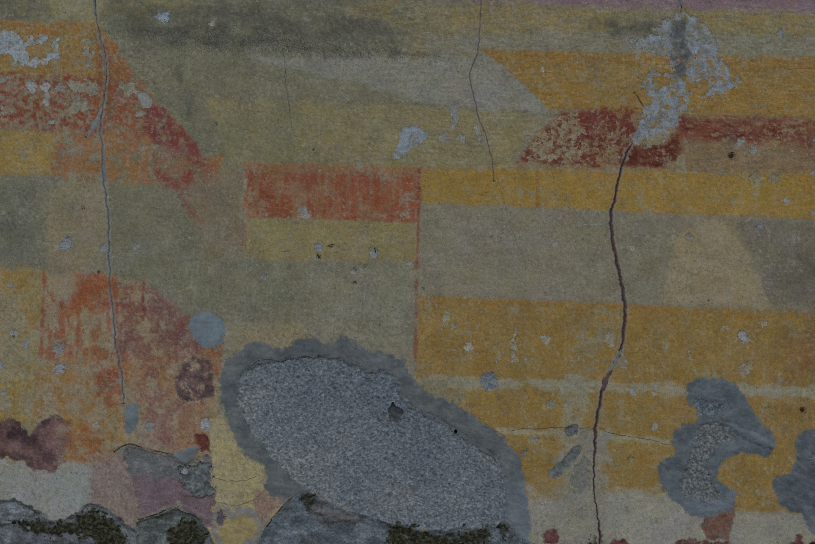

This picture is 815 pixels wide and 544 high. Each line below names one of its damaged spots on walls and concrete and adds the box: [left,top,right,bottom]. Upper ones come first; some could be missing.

peeling [0,29,99,114]
peeling [116,80,153,117]
peeling [391,103,466,160]
crack [467,0,526,266]
flaking render [523,8,742,167]
crack [84,0,127,403]
peeling [480,327,532,392]
flaking render [0,445,218,544]
flaking render [257,492,533,544]